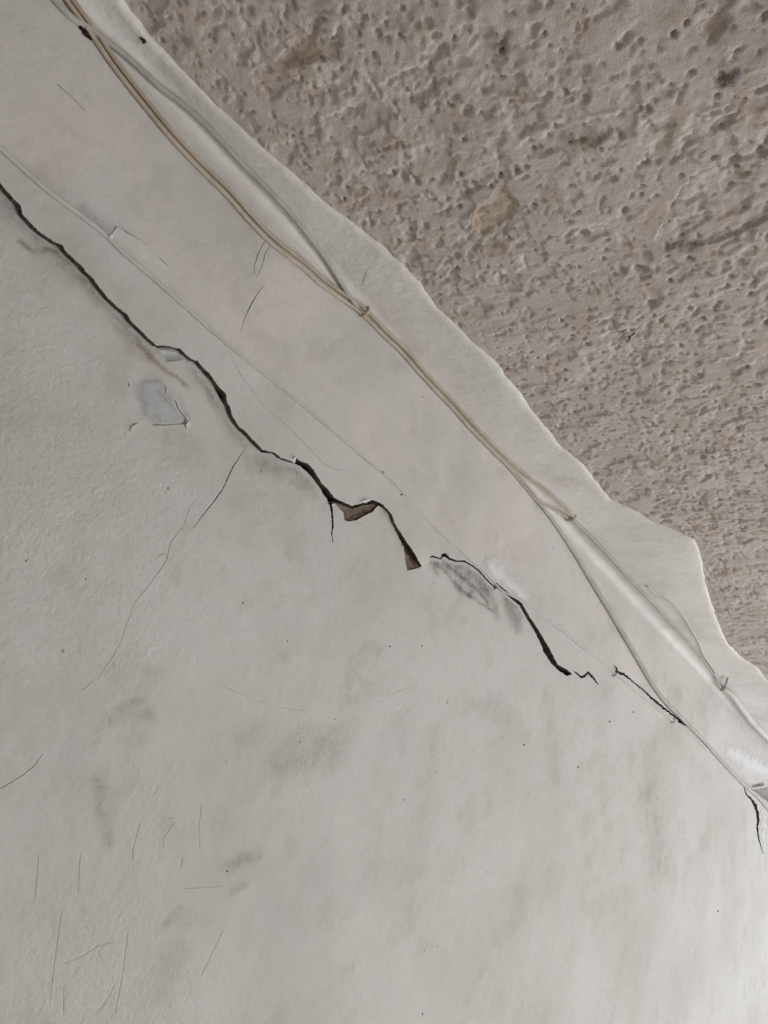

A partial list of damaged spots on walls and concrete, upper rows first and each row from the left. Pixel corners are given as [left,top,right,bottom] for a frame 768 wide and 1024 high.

crack [0,183,686,726]
crack [744,788,763,852]